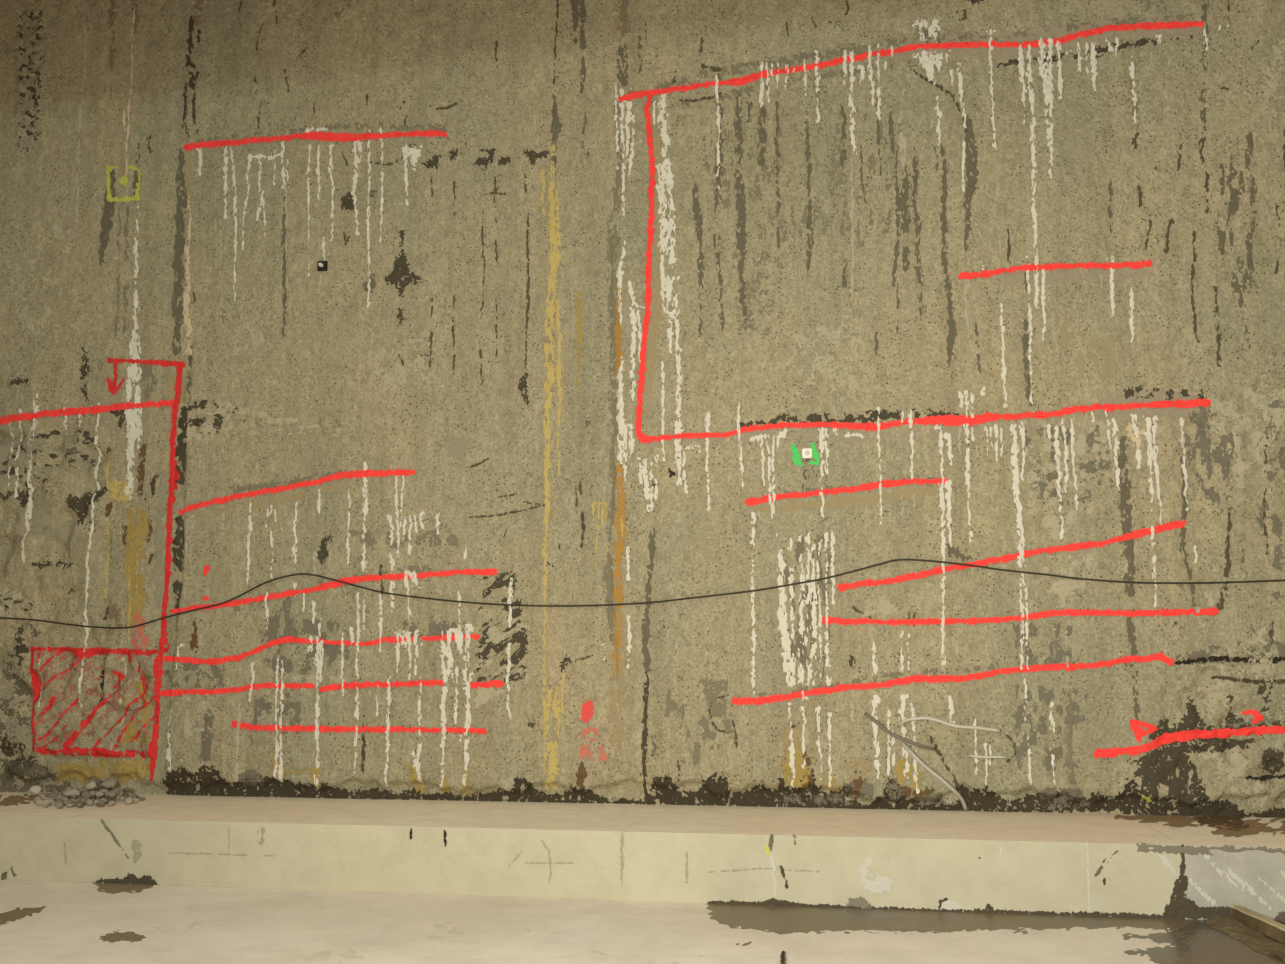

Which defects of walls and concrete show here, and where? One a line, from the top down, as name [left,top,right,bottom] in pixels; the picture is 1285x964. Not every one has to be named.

leakage [15,2,88,362]
crack [1131,129,1285,367]
rust [614,285,624,383]
leakage [162,0,1285,818]
rust [540,145,584,791]
crack [1216,508,1232,614]
spalling [1238,502,1285,571]
crack [1261,436,1269,555]
spalling [1193,676,1230,716]
crack [1175,622,1285,684]
spalling [1245,627,1280,683]
crack [1246,773,1285,781]